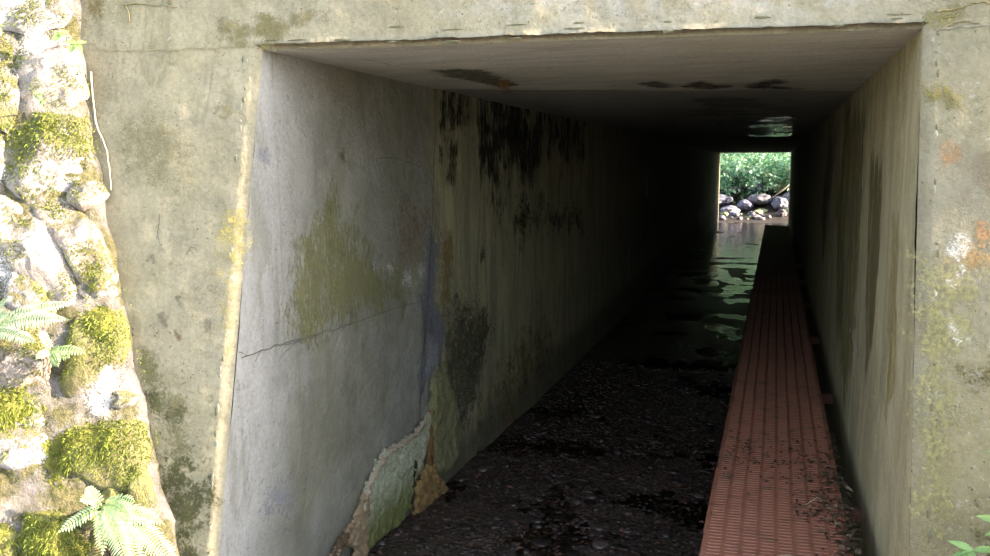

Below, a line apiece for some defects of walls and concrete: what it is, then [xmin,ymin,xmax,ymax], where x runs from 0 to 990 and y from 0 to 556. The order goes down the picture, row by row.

crack [239,99,436,421]
water stain [439,90,585,247]
corrosion [960,219,990,270]
peeling [329,407,432,556]